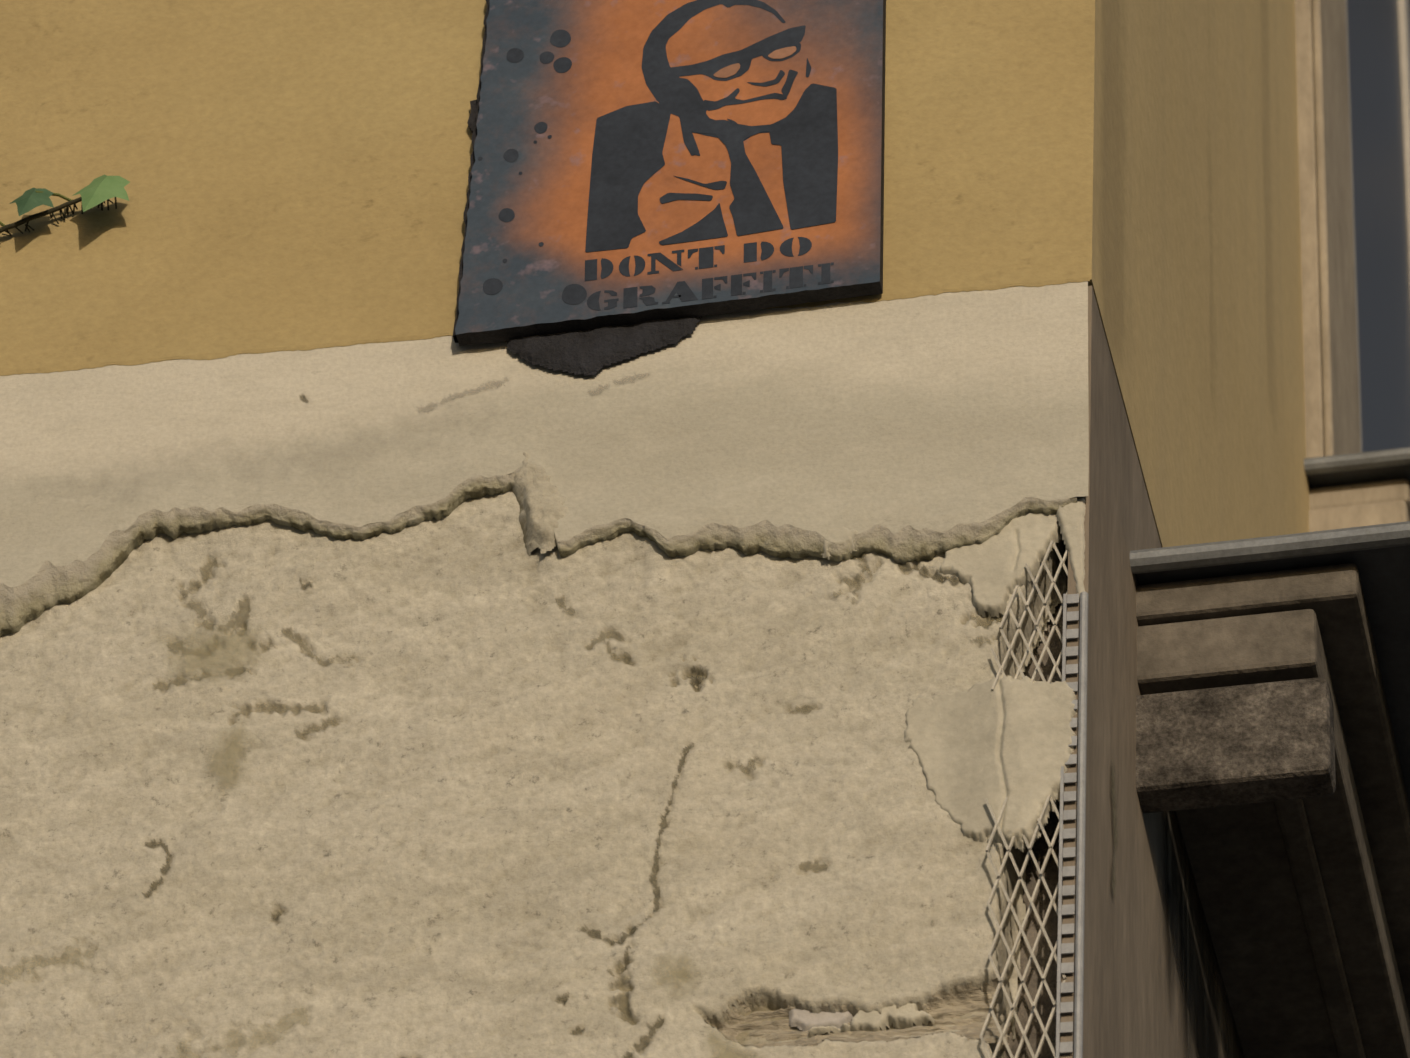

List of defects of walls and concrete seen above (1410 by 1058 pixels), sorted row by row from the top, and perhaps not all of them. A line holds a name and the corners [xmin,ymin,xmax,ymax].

spalling [0,452,1086,1058]
crack [582,746,691,971]
crack [624,1018,664,1058]